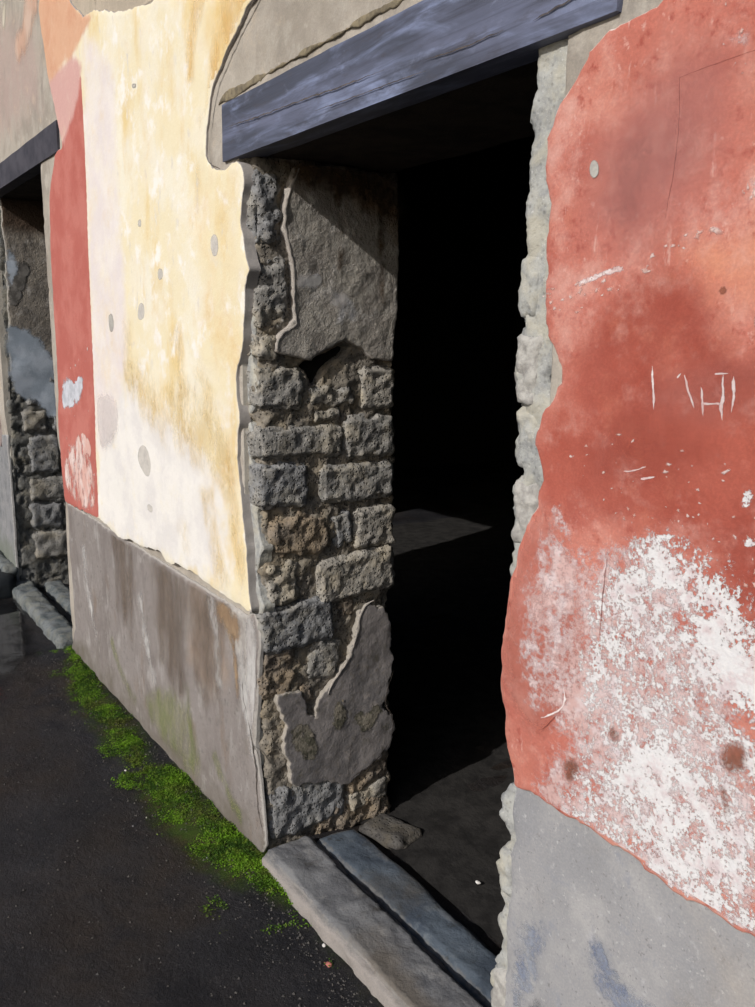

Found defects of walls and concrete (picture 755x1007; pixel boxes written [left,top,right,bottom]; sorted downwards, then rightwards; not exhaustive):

spalling [8,261,29,306]
spalling [290,724,318,760]